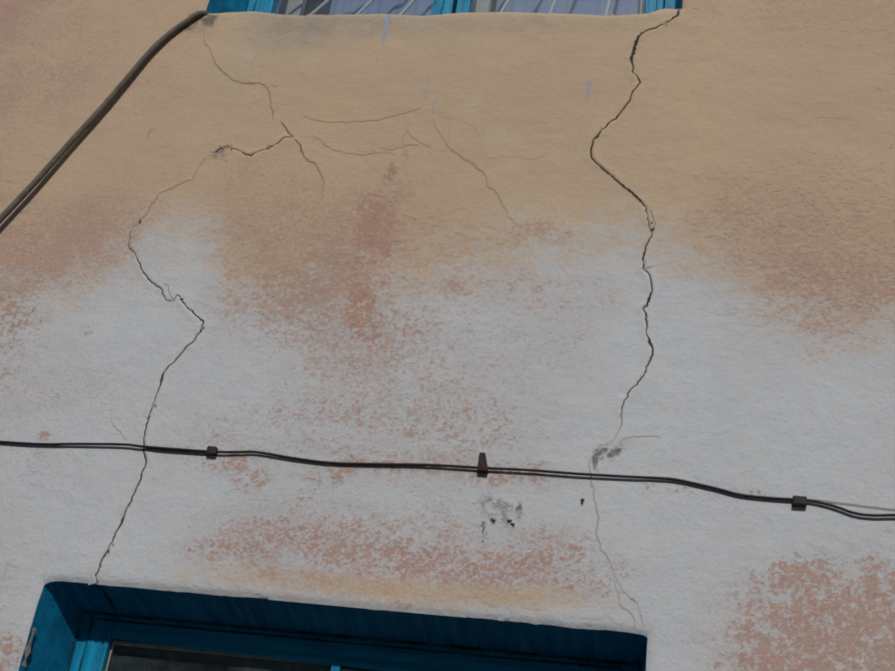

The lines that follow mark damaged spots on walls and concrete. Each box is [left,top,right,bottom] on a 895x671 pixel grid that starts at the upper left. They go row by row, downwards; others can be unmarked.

crack [582,0,686,447]
crack [67,22,644,671]
peeling [0,398,119,506]
peeling [157,393,649,611]
spalling [588,435,661,472]
peeling [710,483,771,499]
peeling [676,521,895,671]